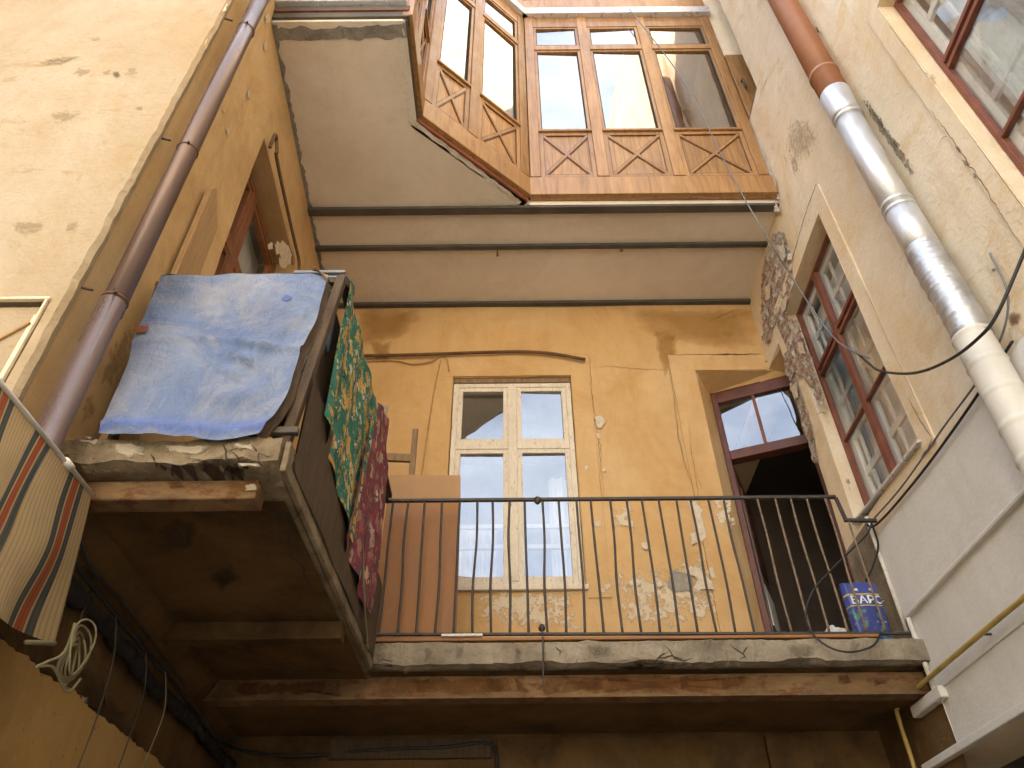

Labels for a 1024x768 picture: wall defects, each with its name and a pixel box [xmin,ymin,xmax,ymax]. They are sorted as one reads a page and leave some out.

peeling [267,240,295,269]
leakage [660,316,734,360]
flaking render [760,230,824,463]
crack [582,353,755,503]
spalling [201,458,257,481]
peeling [688,500,706,544]
peeling [657,565,716,592]